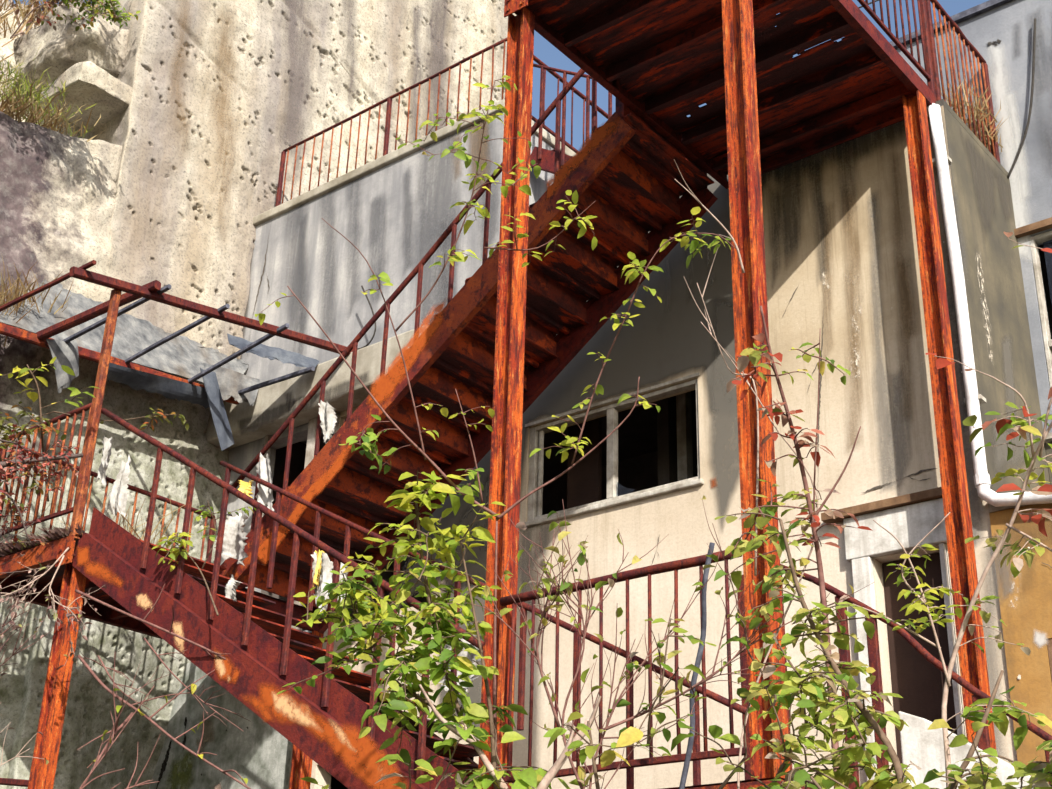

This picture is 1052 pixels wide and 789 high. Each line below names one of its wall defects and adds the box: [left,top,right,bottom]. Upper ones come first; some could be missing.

water stain [291,206,304,330]
water stain [325,195,334,333]
water stain [405,0,454,319]
water stain [478,122,495,242]
corrosion [546,118,619,199]
water stain [772,162,827,273]
corrosion [369,302,444,403]
water stain [872,199,906,487]
water stain [949,312,980,542]
corrosion [258,444,352,563]
crack [156,717,187,789]